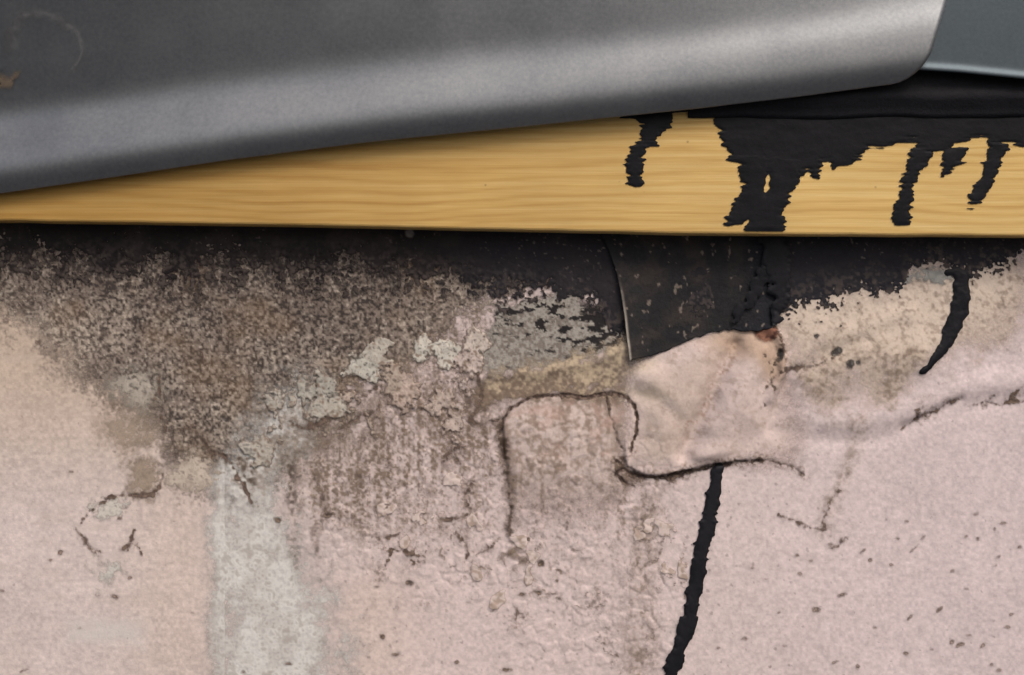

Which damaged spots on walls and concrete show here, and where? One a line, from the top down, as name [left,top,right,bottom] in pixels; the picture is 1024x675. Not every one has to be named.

damp [0,243,641,536]